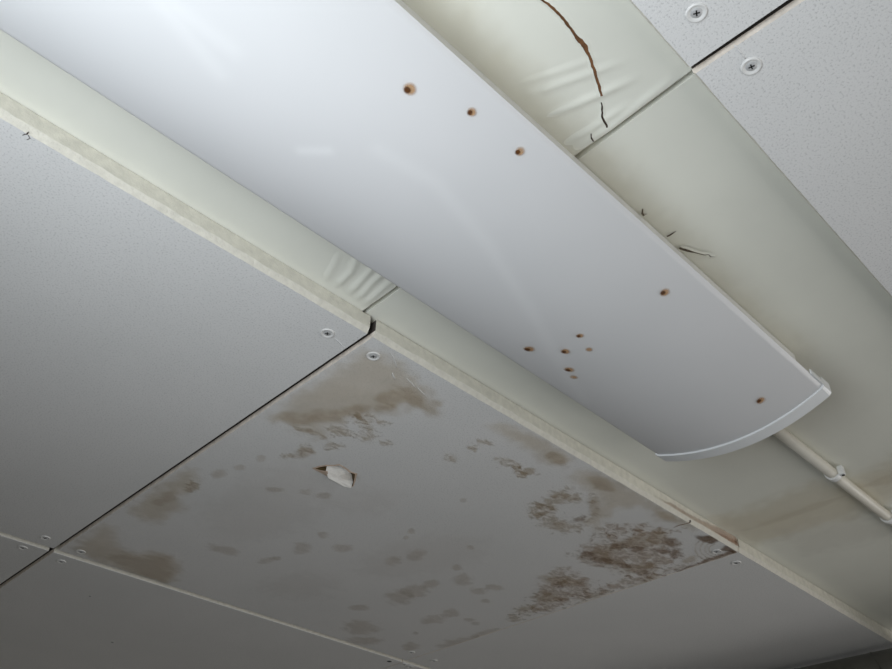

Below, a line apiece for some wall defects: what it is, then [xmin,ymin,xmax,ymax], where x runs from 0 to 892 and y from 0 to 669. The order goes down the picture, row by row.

crack [536,0,611,142]
crack [667,231,716,259]